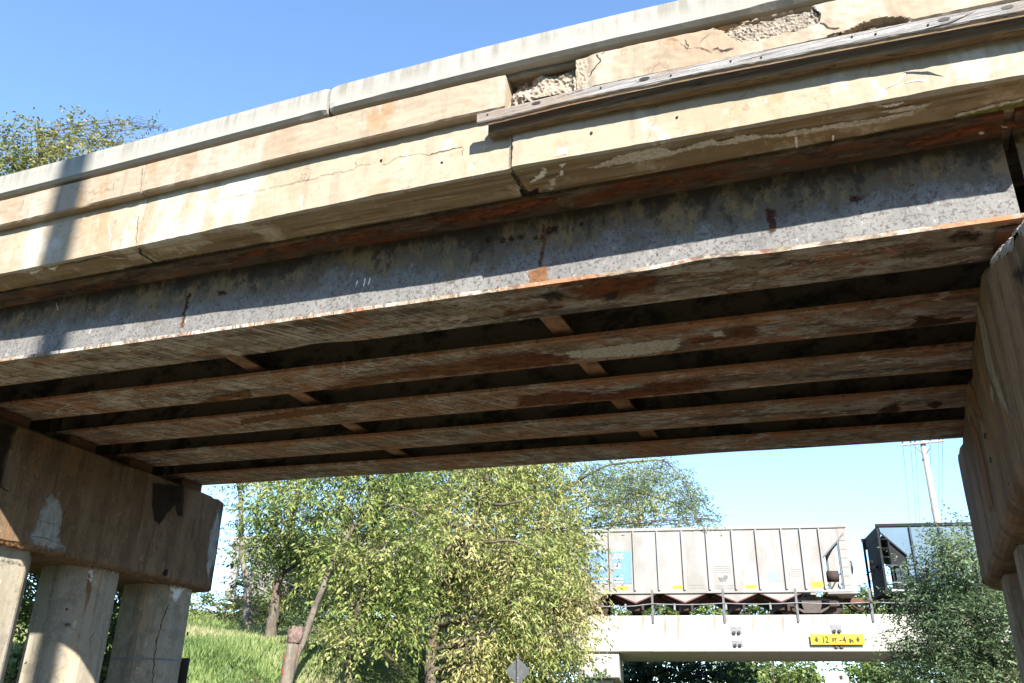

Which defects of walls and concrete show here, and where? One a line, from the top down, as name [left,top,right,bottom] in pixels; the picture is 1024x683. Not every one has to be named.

spalling [726,9,819,42]
spalling [508,58,590,107]
crack [511,136,547,197]
corrosion [765,208,776,232]
corrosion [486,224,558,283]
peeling [31,493,65,549]
leakage [152,483,184,524]
crack [152,605,169,683]